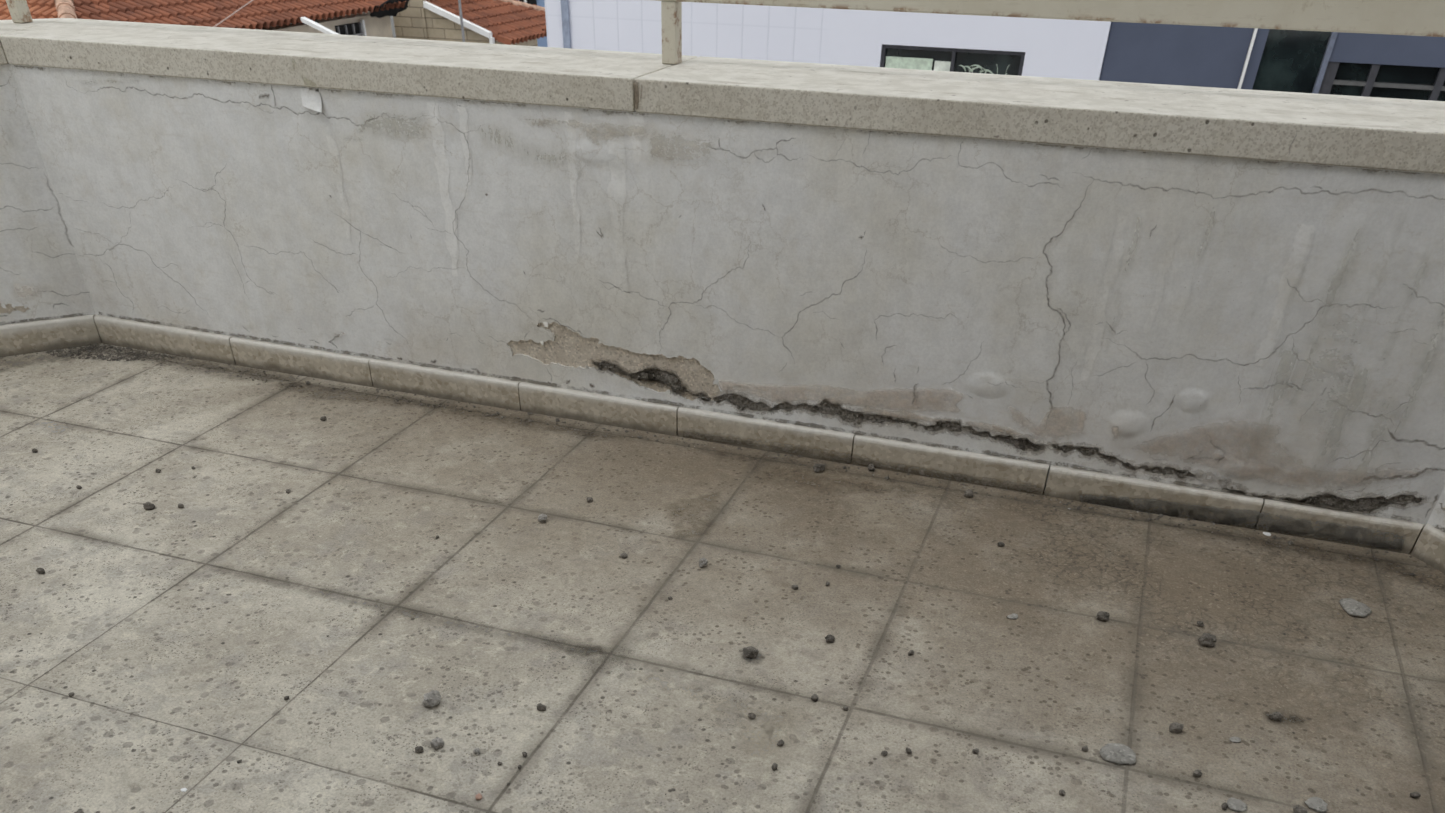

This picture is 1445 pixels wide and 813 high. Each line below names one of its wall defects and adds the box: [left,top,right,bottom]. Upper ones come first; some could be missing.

crack [1043,207,1080,416]
flaking render [507,322,1445,517]
crack [1336,405,1445,515]